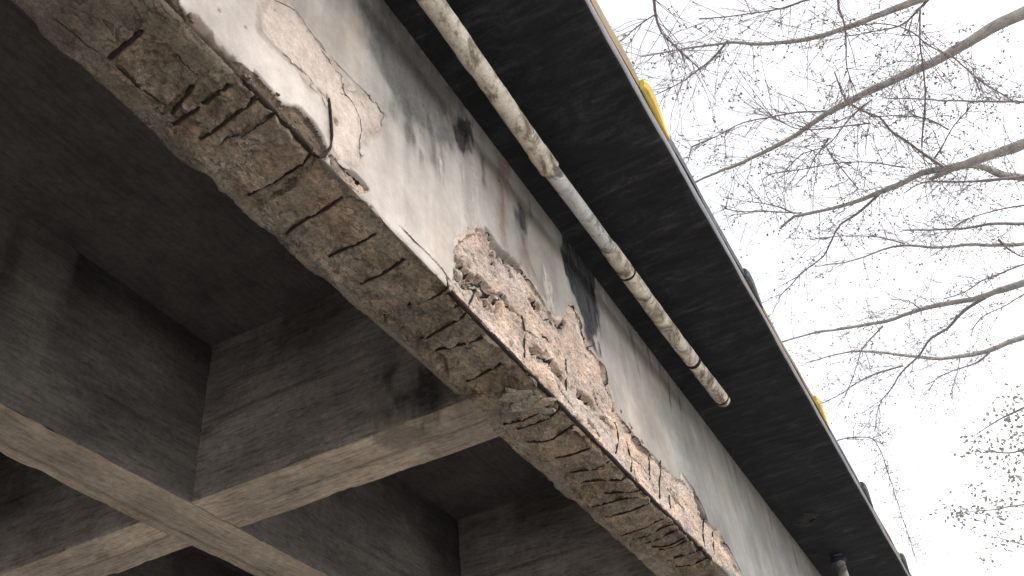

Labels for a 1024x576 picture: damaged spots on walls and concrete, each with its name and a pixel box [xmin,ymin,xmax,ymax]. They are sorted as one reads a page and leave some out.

spalling [101,0,738,572]
water stain [362,0,484,225]